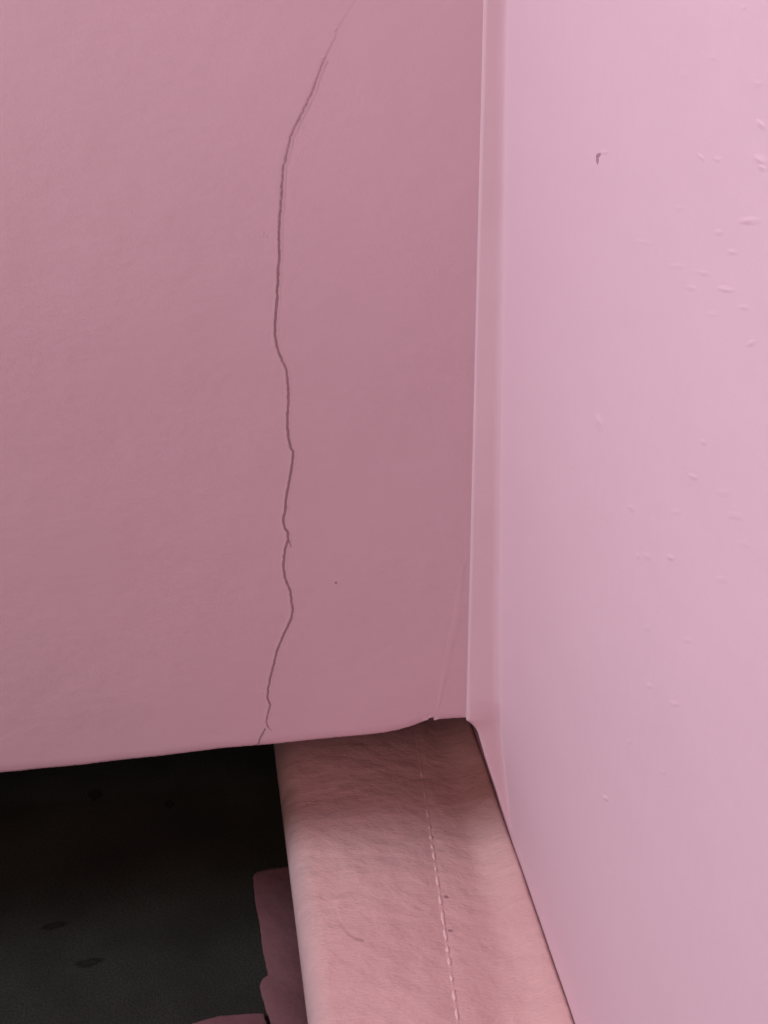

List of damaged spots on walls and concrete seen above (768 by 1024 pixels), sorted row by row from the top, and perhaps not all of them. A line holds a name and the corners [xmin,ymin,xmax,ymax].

crack [257,55,329,745]